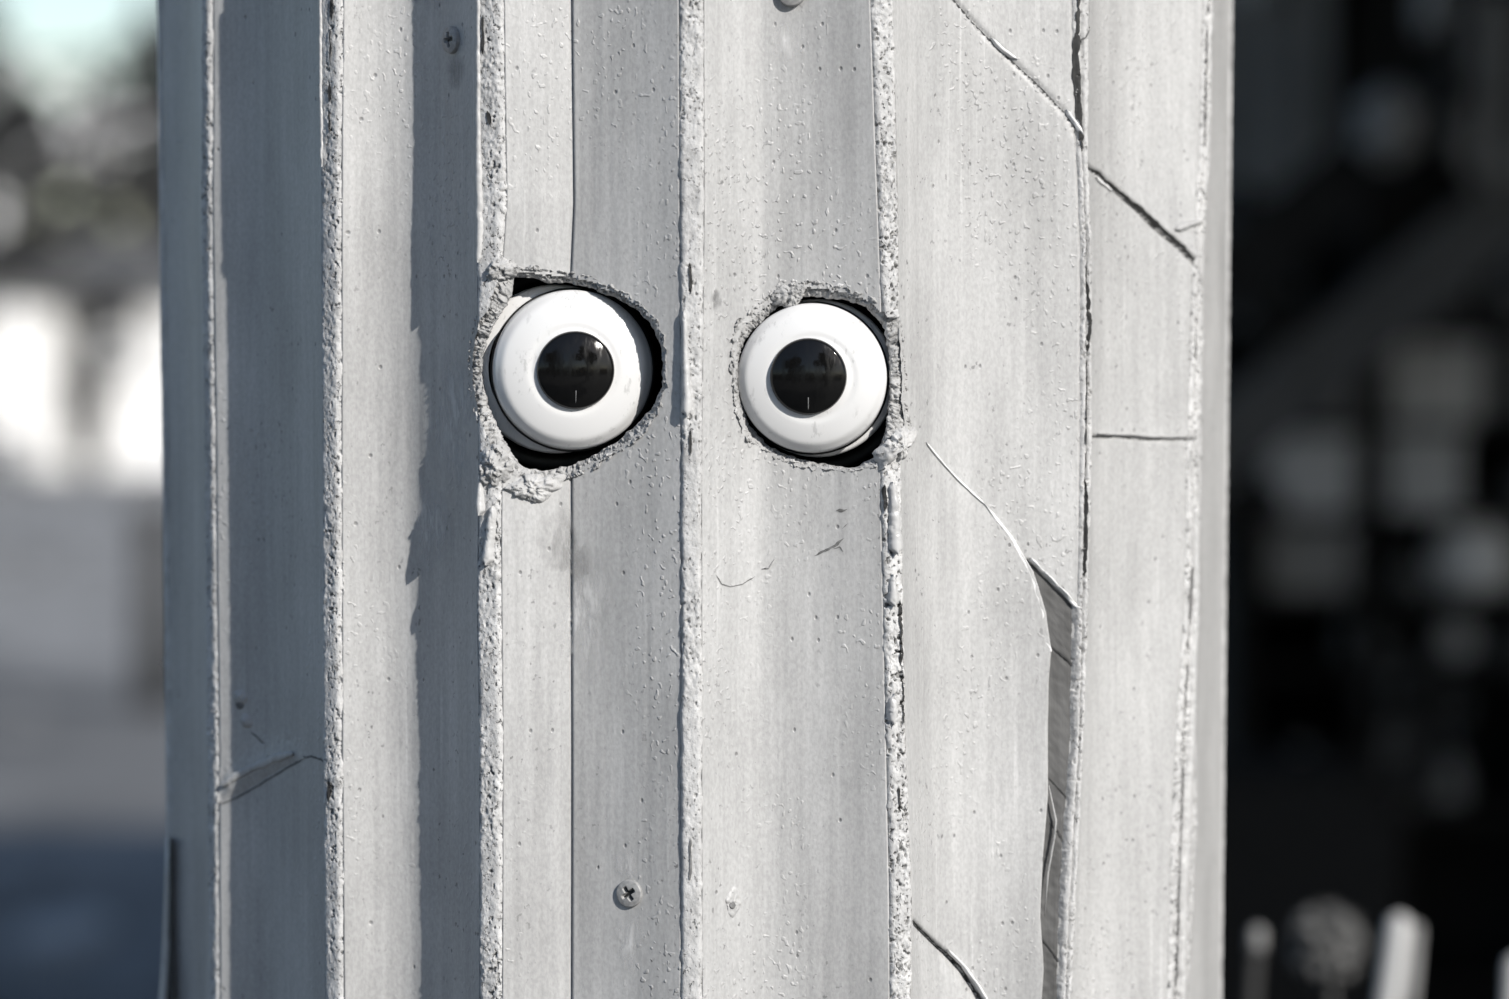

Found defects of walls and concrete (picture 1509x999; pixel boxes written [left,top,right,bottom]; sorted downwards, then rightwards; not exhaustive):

crack [953,0,1203,262]
crack [1083,266,1194,587]
crack [913,921,988,999]